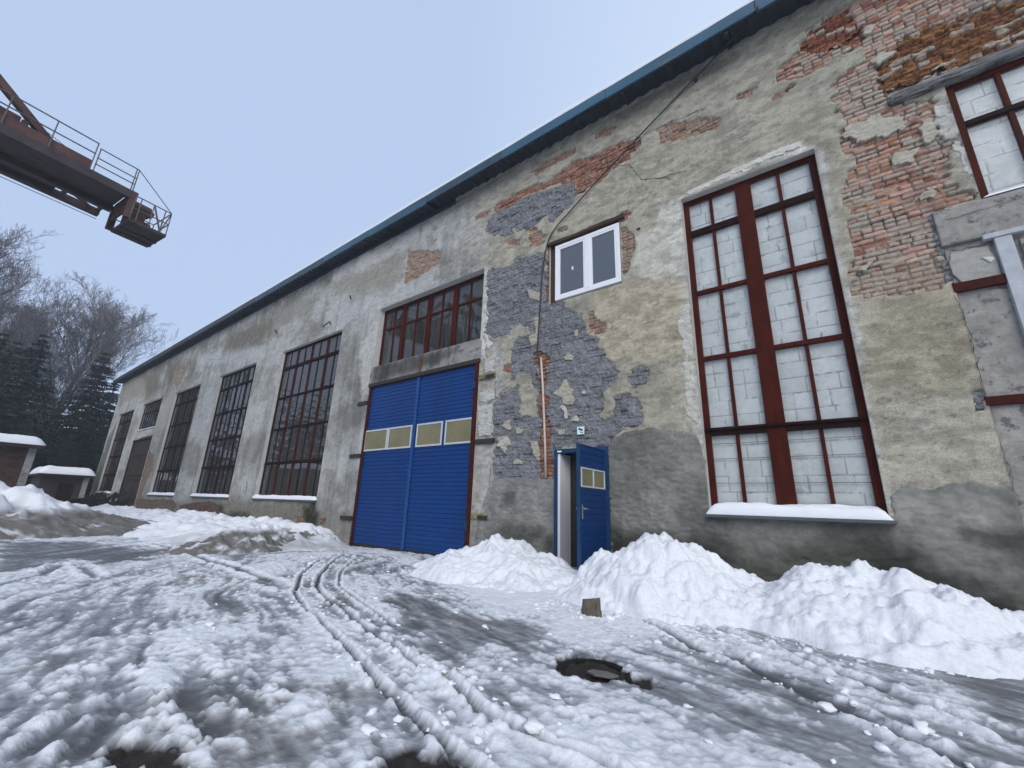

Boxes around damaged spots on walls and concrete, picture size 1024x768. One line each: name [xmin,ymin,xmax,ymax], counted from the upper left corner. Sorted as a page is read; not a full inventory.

flaking render [656,117,720,145]
flaking render [772,0,1024,299]
crack [619,156,686,209]
flaking render [404,250,441,285]
peeling [475,127,652,480]
water stain [885,558,939,585]